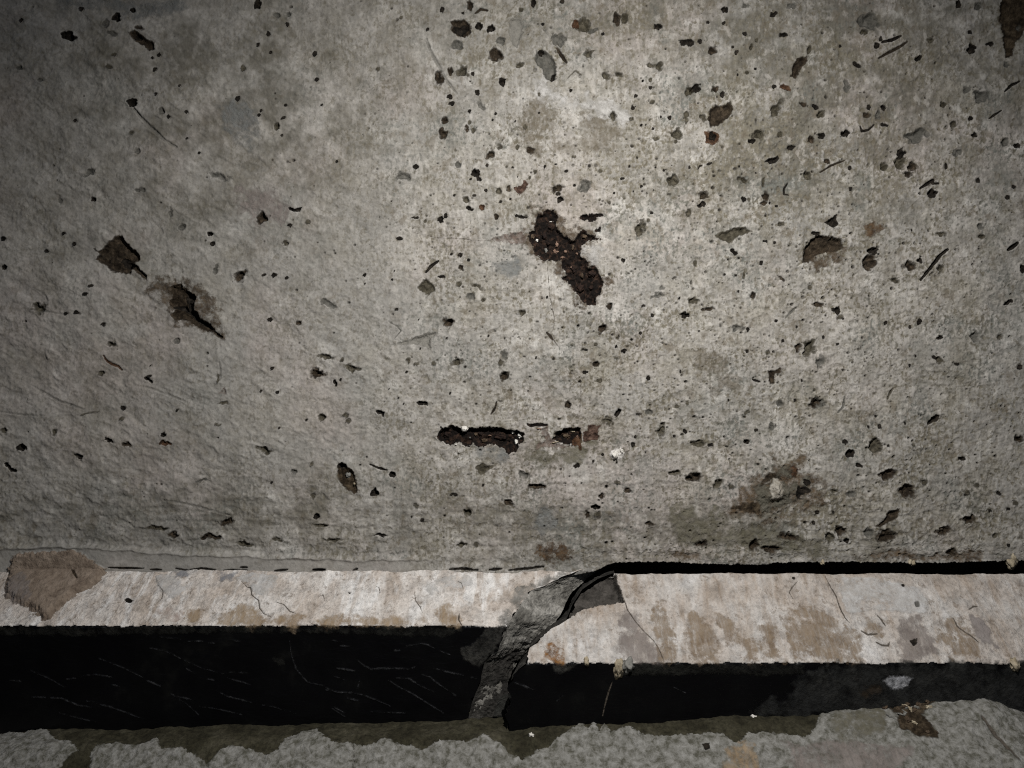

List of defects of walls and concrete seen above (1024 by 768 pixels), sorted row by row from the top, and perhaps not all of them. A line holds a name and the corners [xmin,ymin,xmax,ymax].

spalling [94,235,147,280]
rust [492,207,613,309]
spalling [802,214,846,273]
spalling [169,284,223,338]
peeling [460,571,569,666]
spalling [569,573,625,618]